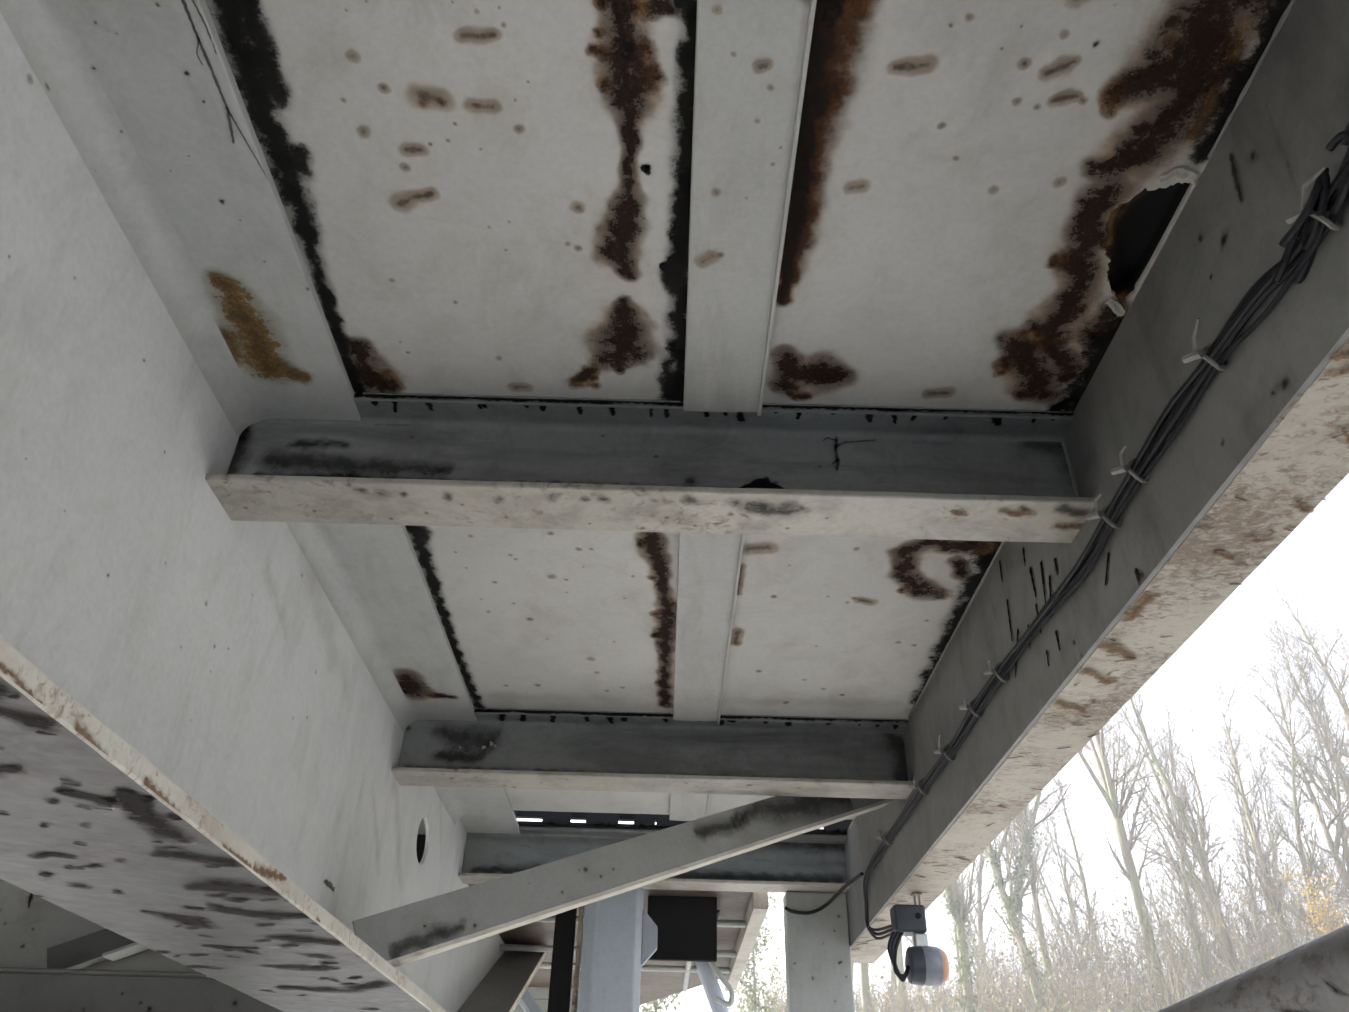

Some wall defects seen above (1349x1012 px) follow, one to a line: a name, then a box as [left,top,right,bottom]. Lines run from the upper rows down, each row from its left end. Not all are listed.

crack [181,0,267,179]
leakage [243,0,291,109]
corrosion [349,0,684,406]
leakage [660,219,677,285]
corrosion [762,0,1276,416]
corrosion [207,271,311,384]
leakage [657,358,673,401]
crack [823,436,875,471]
corrosion [474,528,677,717]
corrosion [889,539,1003,601]
corrosion [1006,547,1171,686]
corrosion [395,670,457,700]